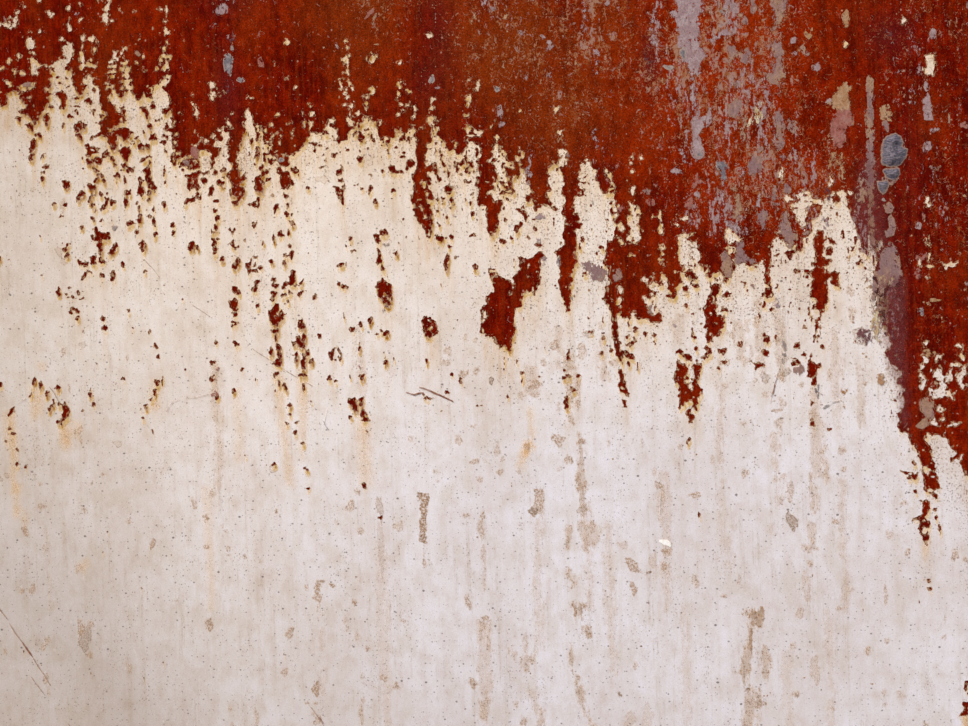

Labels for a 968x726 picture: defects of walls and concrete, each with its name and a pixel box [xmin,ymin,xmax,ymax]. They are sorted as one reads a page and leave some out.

peeling [223,31,245,93]
peeling [710,0,757,64]
peeling [760,0,821,94]
peeling [714,89,801,166]
peeling [684,173,702,209]
peeling [715,160,755,277]
peeling [756,182,809,250]
peeling [825,75,968,361]
rust [0,0,968,546]
peeling [582,260,623,283]
peeling [916,397,935,429]
rust [959,680,968,725]